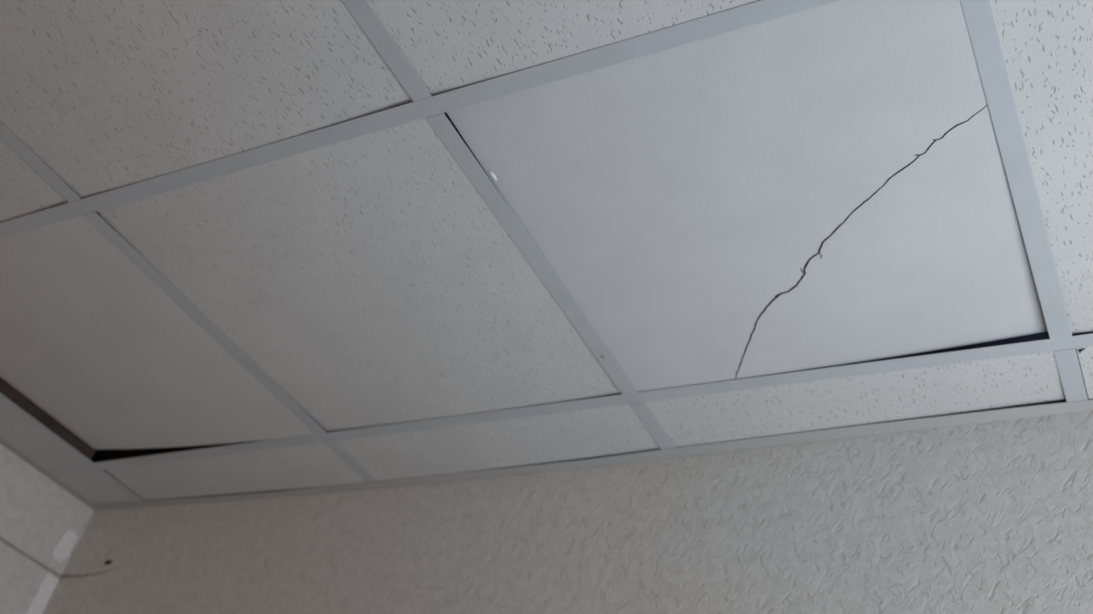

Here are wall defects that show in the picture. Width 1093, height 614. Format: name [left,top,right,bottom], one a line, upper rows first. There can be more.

crack [735,104,988,379]